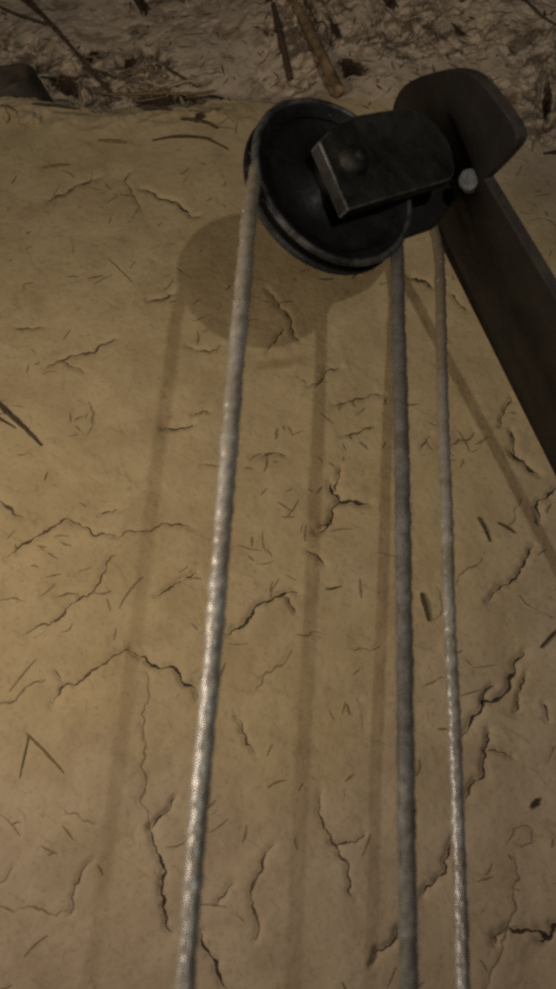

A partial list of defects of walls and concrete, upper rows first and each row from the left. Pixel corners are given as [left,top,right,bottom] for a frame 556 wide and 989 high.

crack [45,339,114,372]
crack [0,501,194,634]
crack [306,469,366,565]
crack [223,591,325,690]
crack [463,652,526,799]
crack [0,649,198,933]
crack [318,792,365,901]
crack [486,825,556,986]
crack [201,933,227,989]